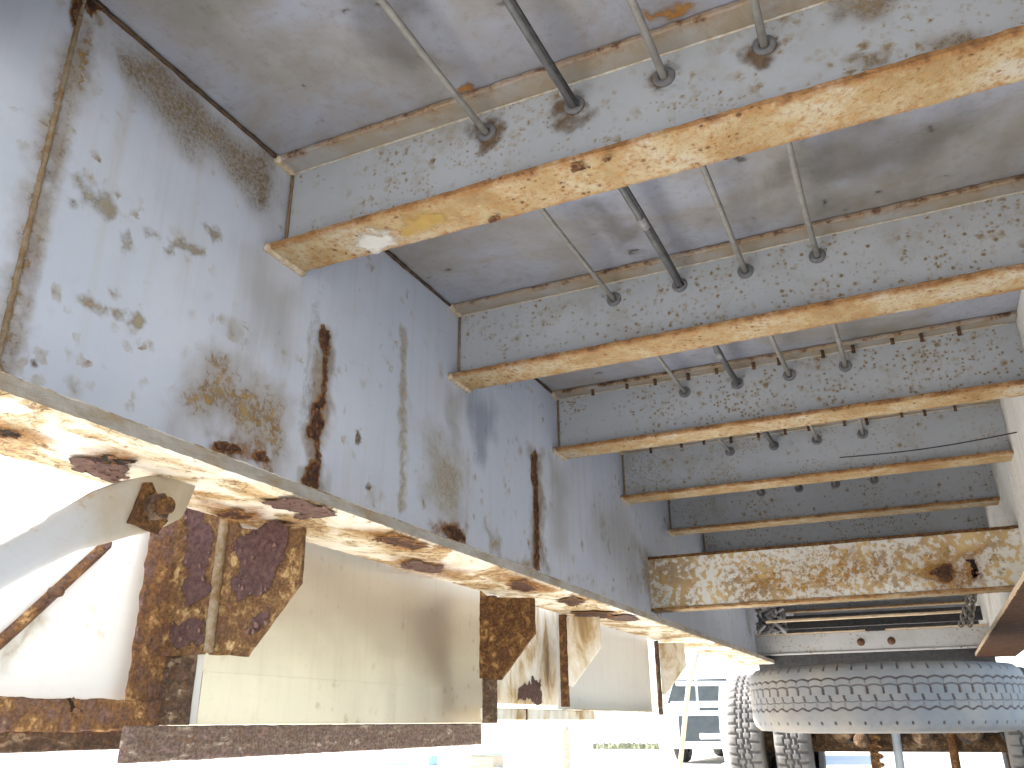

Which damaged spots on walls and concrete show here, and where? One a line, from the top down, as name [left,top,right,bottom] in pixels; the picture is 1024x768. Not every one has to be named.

corrosion [744,41,779,69]
corrosion [474,120,504,153]
corrosion [569,163,586,173]
corrosion [184,354,285,472]
corrosion [68,457,132,483]
corrosion [169,497,338,649]
corrosion [739,546,980,602]
corrosion [517,676,542,706]